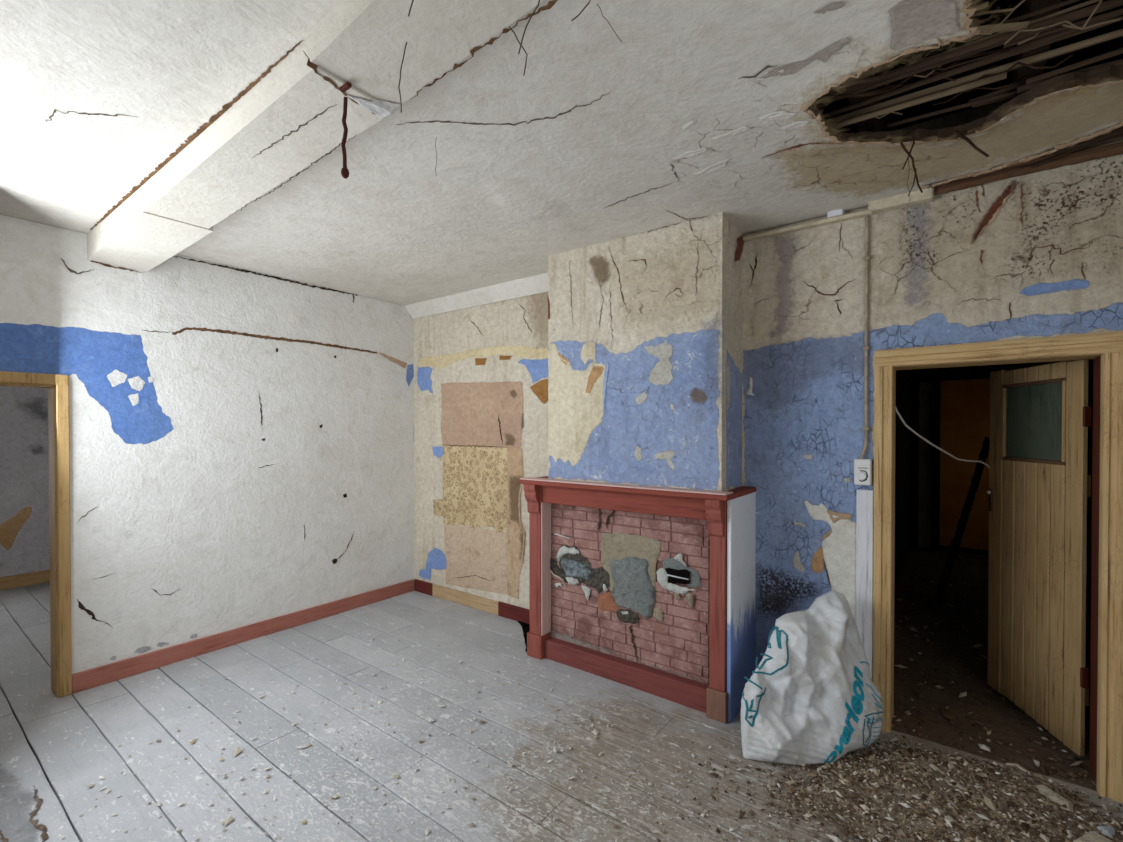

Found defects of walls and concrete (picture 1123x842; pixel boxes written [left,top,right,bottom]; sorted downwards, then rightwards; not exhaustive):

crack [90,0,610,230]
corrosion [973,181,1024,264]
leakage [1024,161,1122,240]
crack [61,258,141,274]
crack [173,256,358,303]
crack [143,327,407,368]
peeling [0,323,174,444]
peeling [406,364,433,393]
peeling [475,302,1123,669]
flaking render [0,507,32,551]
leakage [759,569,814,614]
leakage [29,785,49,842]